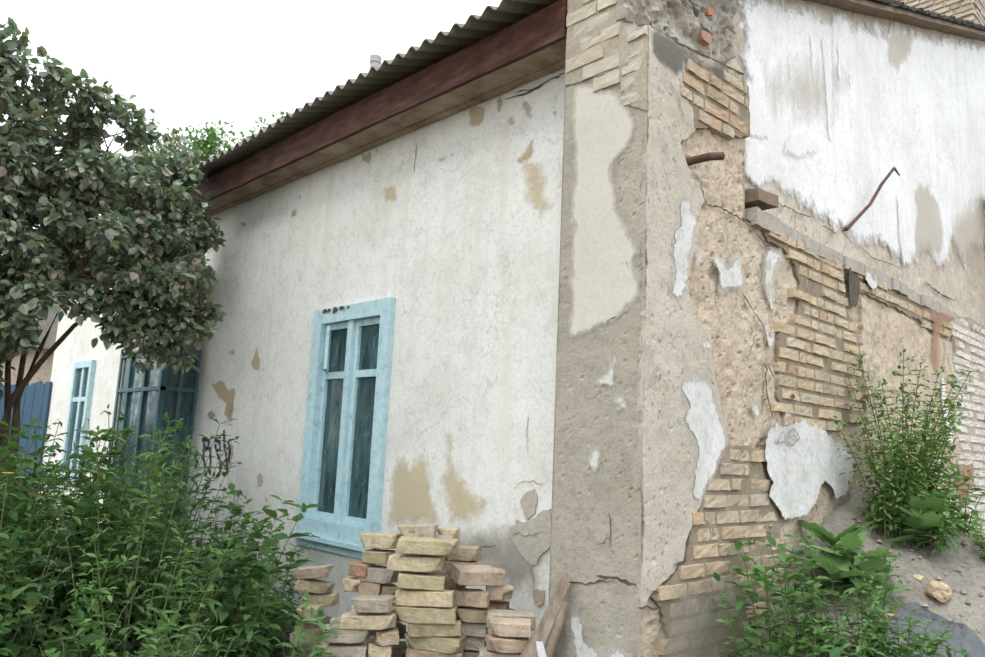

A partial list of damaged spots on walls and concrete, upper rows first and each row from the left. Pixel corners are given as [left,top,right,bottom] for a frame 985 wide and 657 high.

spalling [566,0,748,141]
crack [701,186,787,253]
peeling [209,381,234,419]
spalling [767,231,985,542]
crack [570,575,661,611]
spalling [656,449,794,648]